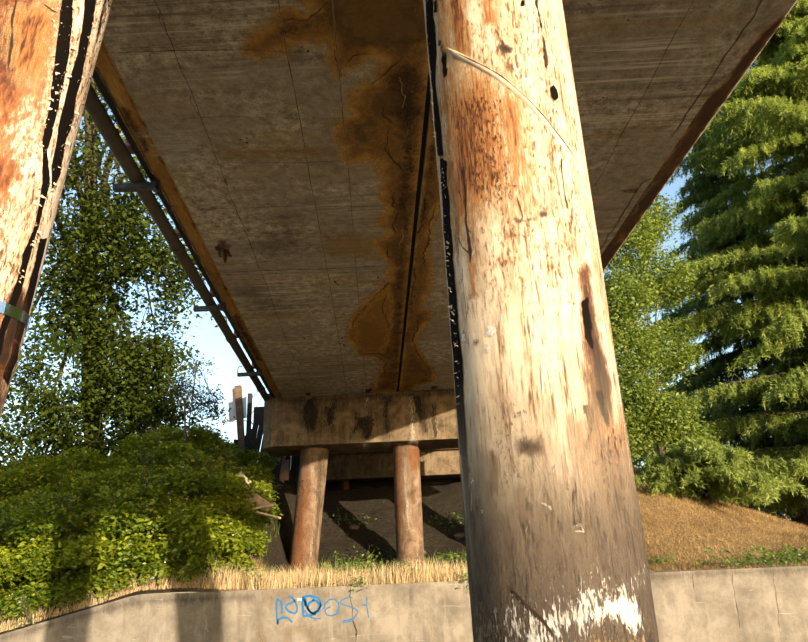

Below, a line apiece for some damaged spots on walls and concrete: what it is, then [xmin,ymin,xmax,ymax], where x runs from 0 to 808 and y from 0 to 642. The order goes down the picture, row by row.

corrosion [0,313,27,418]
corrosion [0,0,112,312]
leakage [92,39,343,432]
corrosion [215,240,232,263]
leakage [239,0,450,440]
corrosion [429,0,659,642]